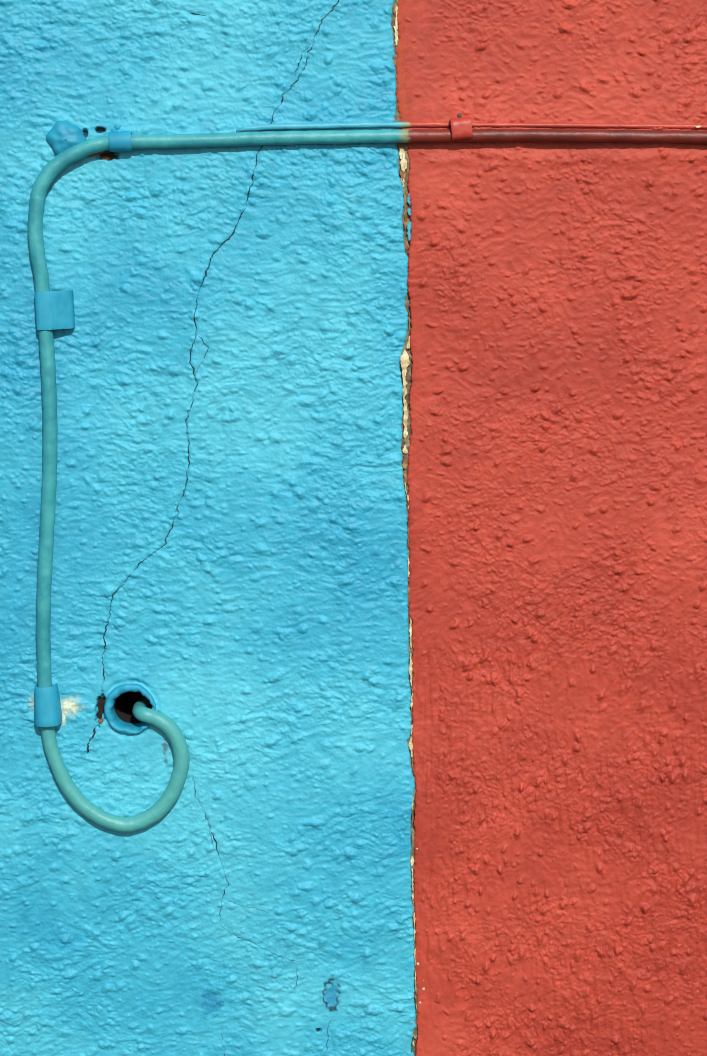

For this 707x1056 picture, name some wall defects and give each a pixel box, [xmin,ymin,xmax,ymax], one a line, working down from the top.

peeling [399,148,411,255]
crack [102,0,339,683]
peeling [400,311,411,508]
crack [193,777,299,988]